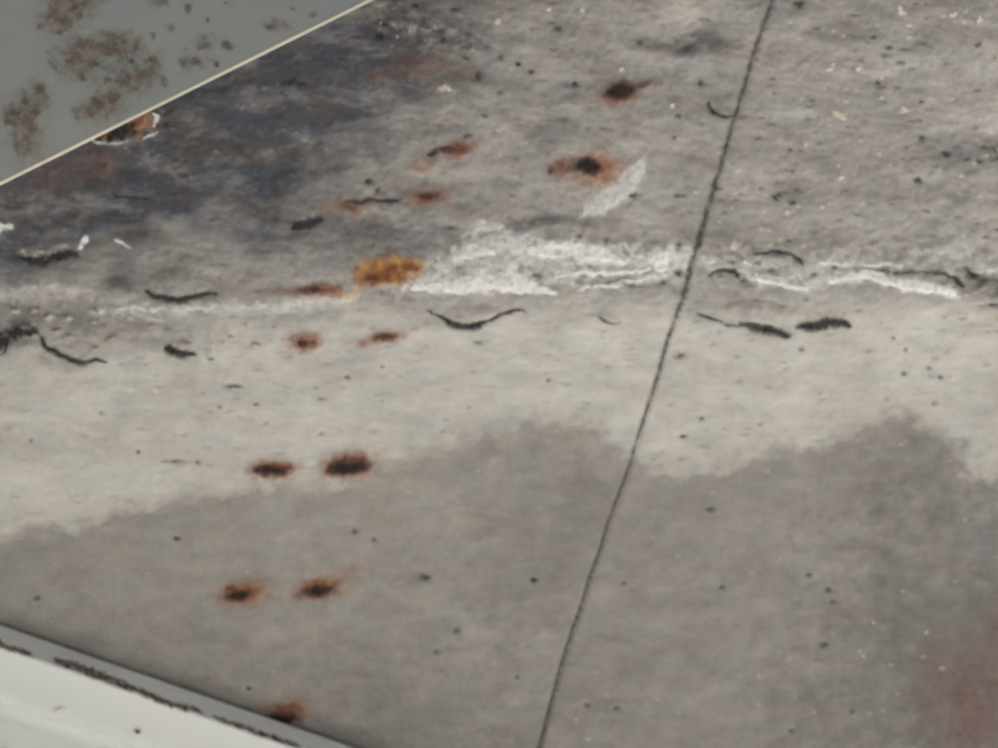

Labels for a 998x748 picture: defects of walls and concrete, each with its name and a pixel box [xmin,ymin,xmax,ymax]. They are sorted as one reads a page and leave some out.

rust [548,155,617,183]
rust [272,255,424,299]
leakage [402,221,716,295]
crack [708,268,739,278]
leakage [739,260,960,300]
crack [865,267,998,307]
crack [0,324,107,365]
crack [696,314,852,339]
rust [252,462,294,478]
rust [324,452,372,478]
leakage [0,417,998,748]
rust [55,658,304,747]